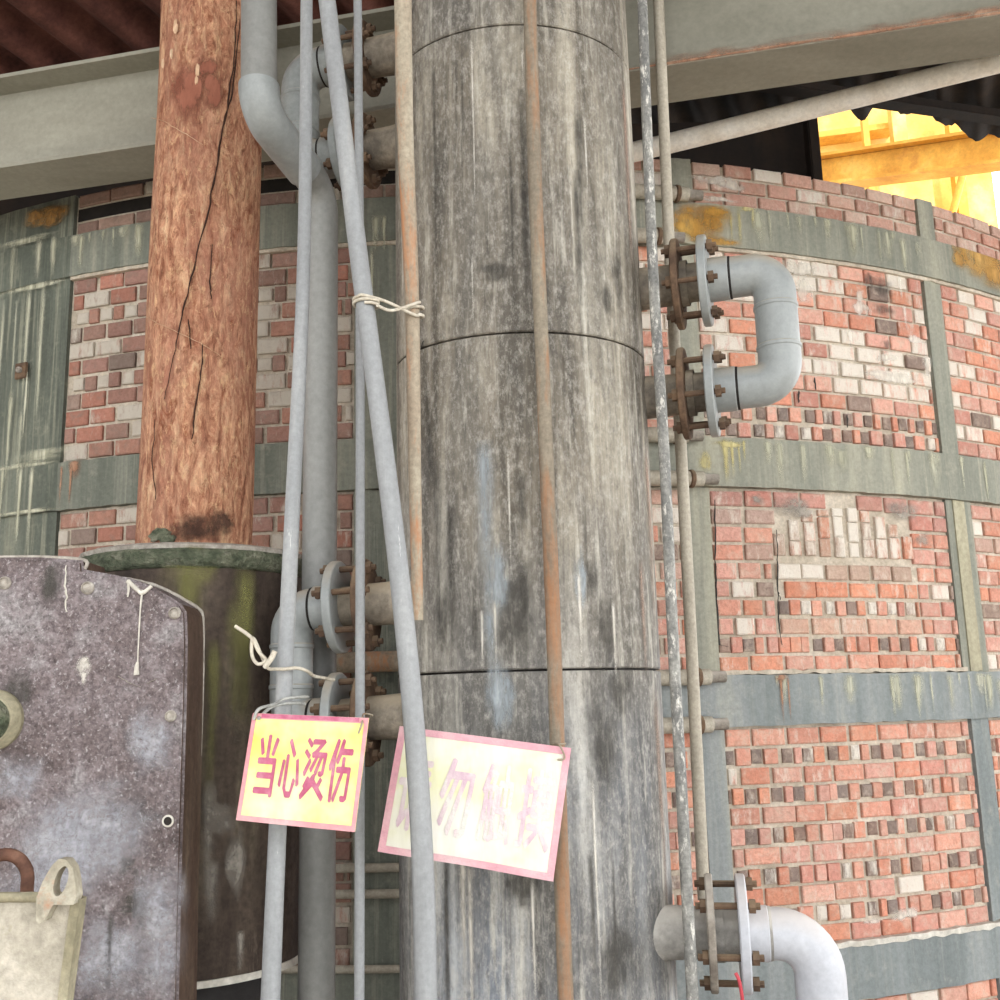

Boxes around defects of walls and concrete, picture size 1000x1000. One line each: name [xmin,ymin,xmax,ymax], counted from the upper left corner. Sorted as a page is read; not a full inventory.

corrosion [27,207,67,226]
crack [147,0,240,439]
corrosion [674,207,735,245]
corrosion [955,247,1000,284]
crack [149,421,157,500]
leakage [177,512,233,536]
crack [775,530,783,644]